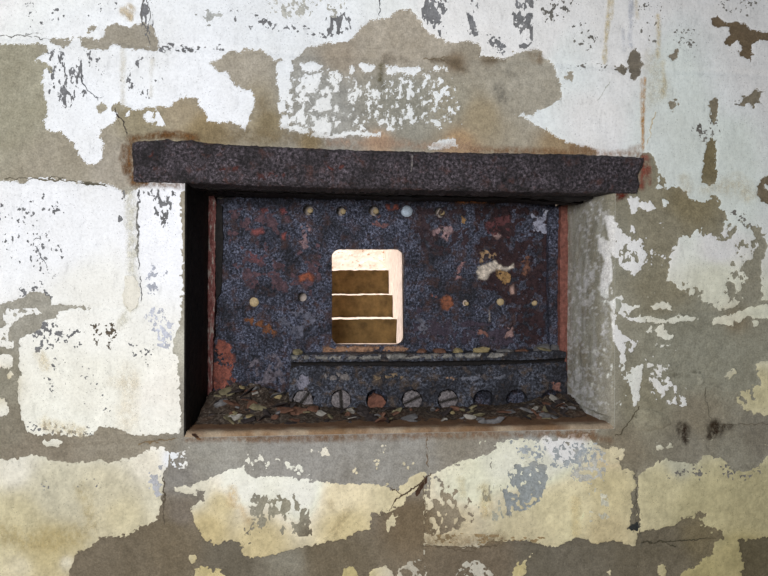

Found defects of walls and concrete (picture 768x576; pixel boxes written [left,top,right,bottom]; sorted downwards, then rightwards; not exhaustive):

peeling [711,0,768,62]
peeling [597,48,644,81]
peeling [0,0,597,201]
peeling [691,97,720,186]
corrosion [192,187,593,213]
corrosion [496,269,514,294]
corrosion [213,340,236,390]
corrosion [297,375,310,390]
peeling [0,152,768,576]
corrosion [292,344,559,360]
damp [707,420,731,438]
crack [389,433,499,553]